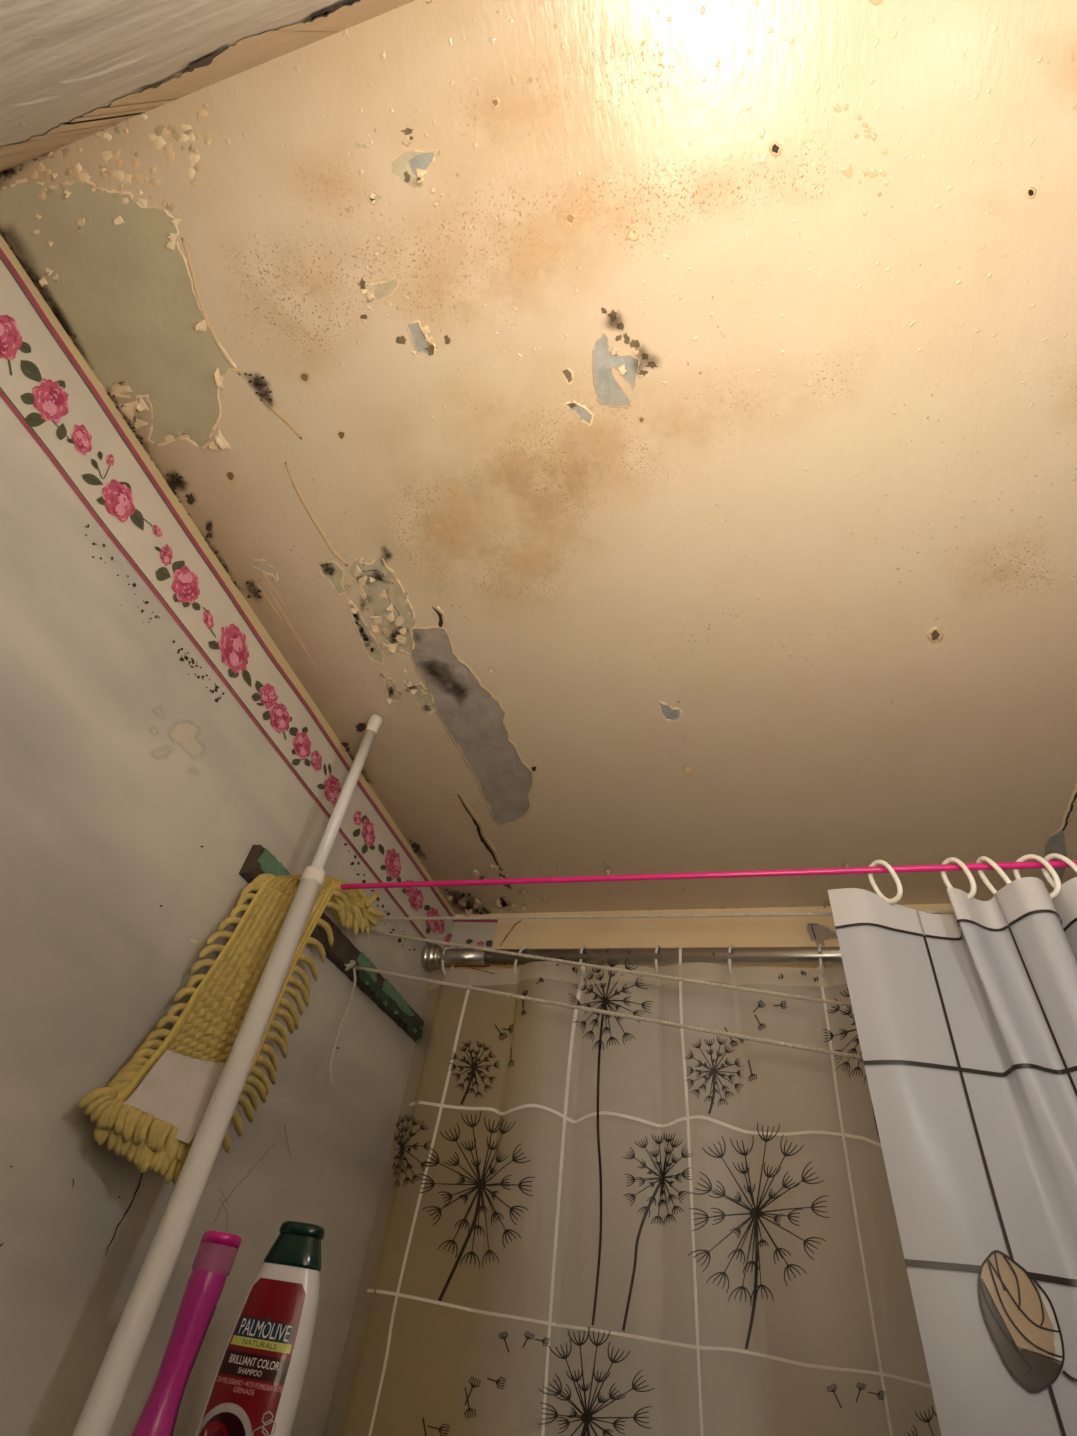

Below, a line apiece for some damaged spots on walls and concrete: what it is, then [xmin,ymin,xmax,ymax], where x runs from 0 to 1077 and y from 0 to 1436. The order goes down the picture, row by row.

spalling [769,141,783,158]
peeling [0,0,441,451]
peeling [396,320,450,358]
peeling [562,307,658,427]
water stain [85,524,160,623]
water stain [172,640,225,702]
spalling [319,551,538,827]
crack [457,793,522,946]
crack [1045,782,1077,881]